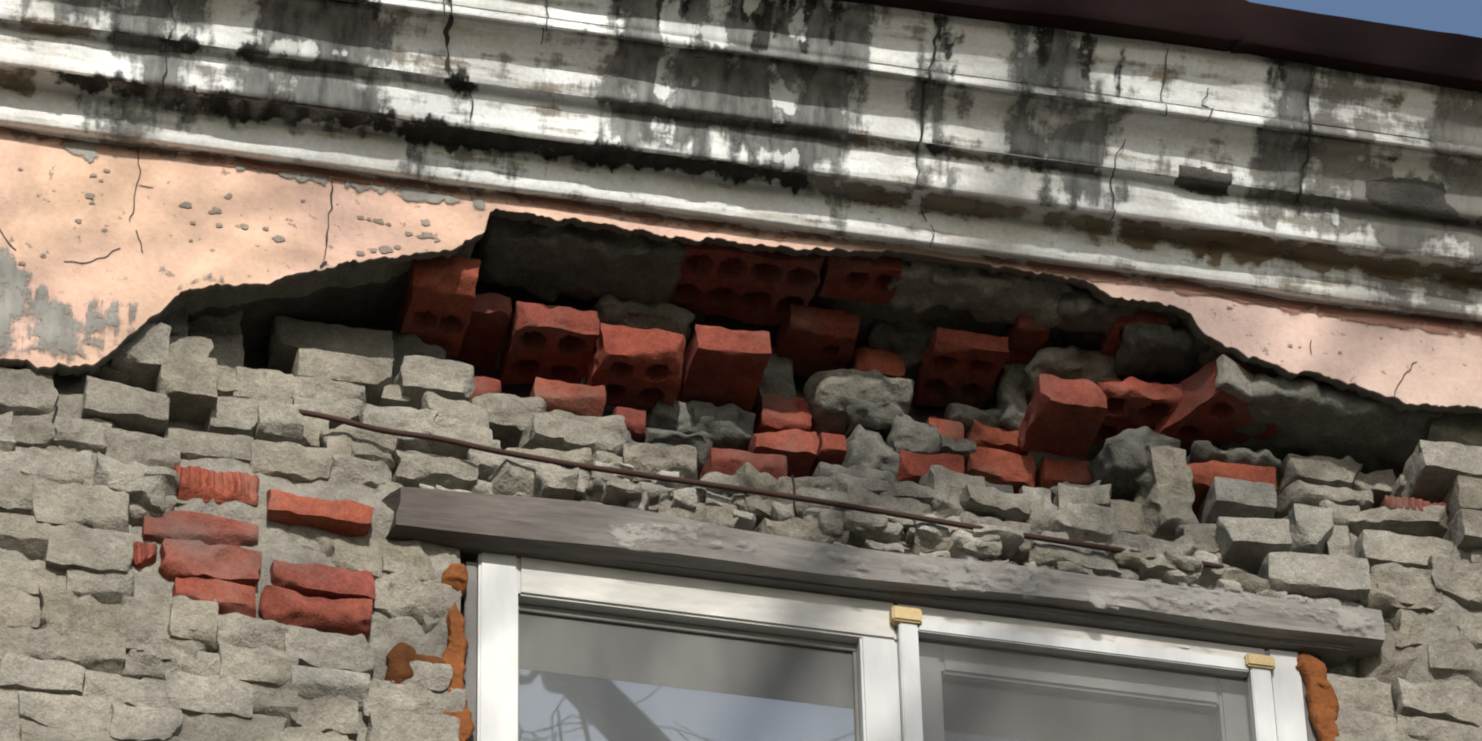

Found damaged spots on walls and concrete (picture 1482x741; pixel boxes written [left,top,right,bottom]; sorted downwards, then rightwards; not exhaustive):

crack [442,0,474,119]
crack [64,150,153,264]
crack [320,181,333,268]
damp [0,0,1128,246]
spalling [1174,165,1232,197]
crack [1294,64,1315,212]
damp [1255,58,1482,265]
spalling [1365,157,1482,227]
peeling [0,247,137,362]
spalling [179,165,1210,483]
spalling [1027,373,1444,504]